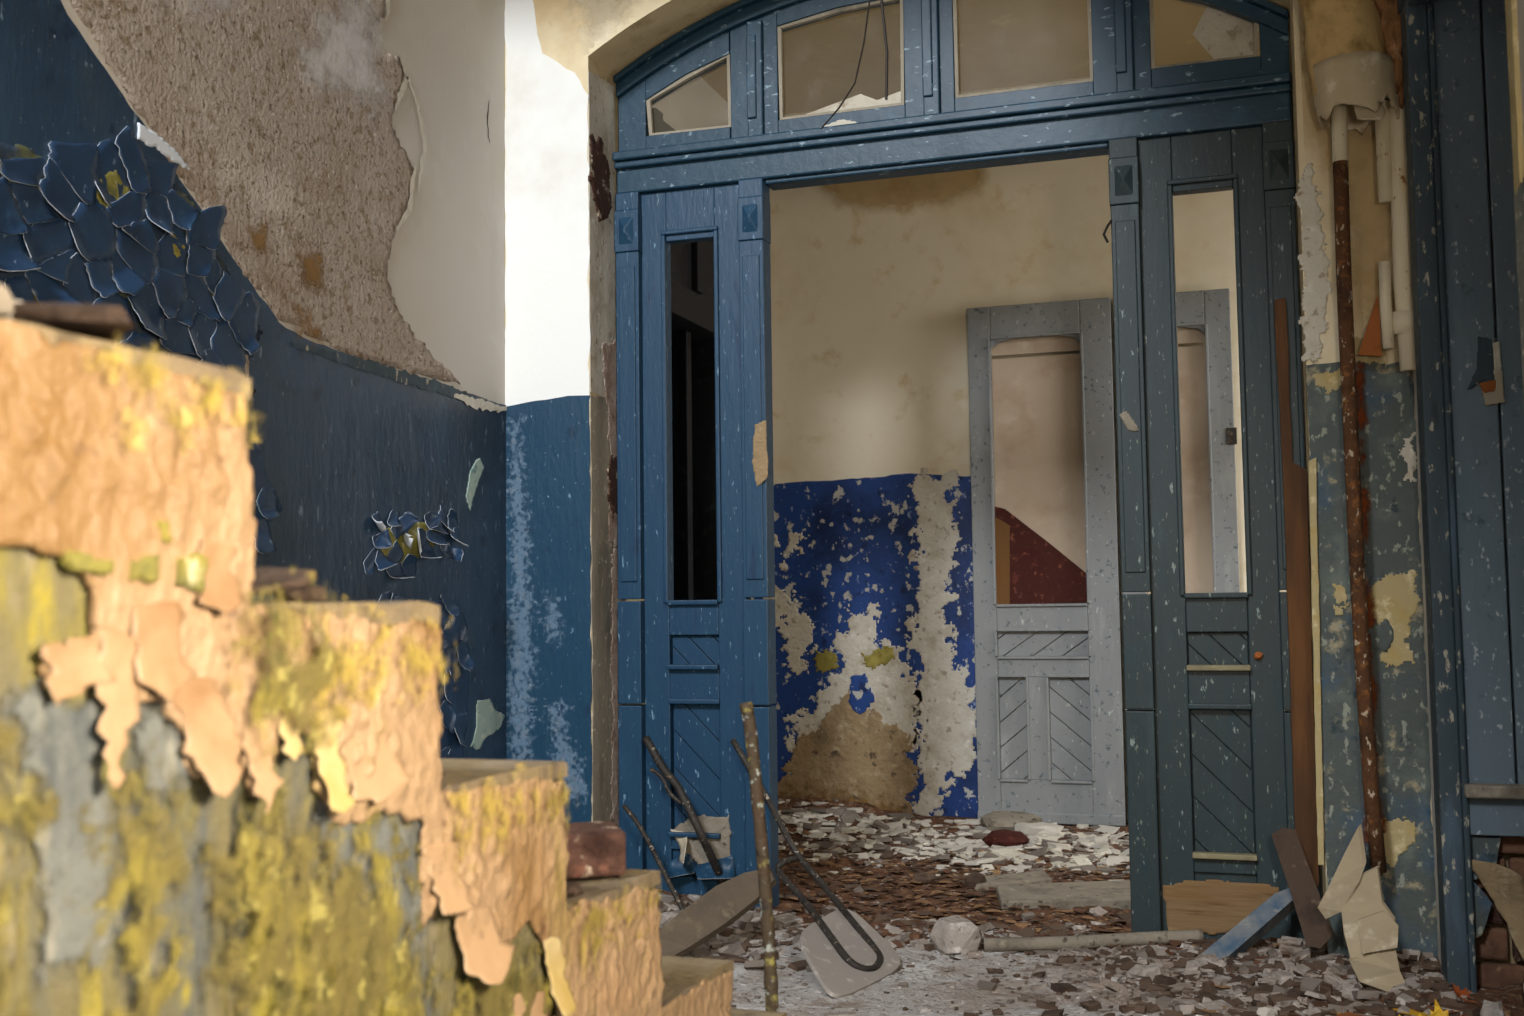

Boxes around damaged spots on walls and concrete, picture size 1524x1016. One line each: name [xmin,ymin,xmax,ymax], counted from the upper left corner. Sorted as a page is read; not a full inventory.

peeling [1294,163,1386,394]
corrosion [1356,363,1367,463]
peeling [0,0,735,1016]
corrosion [1361,488,1370,538]
peeling [763,468,1130,882]
corrosion [1366,581,1377,711]
peeling [1368,570,1421,667]